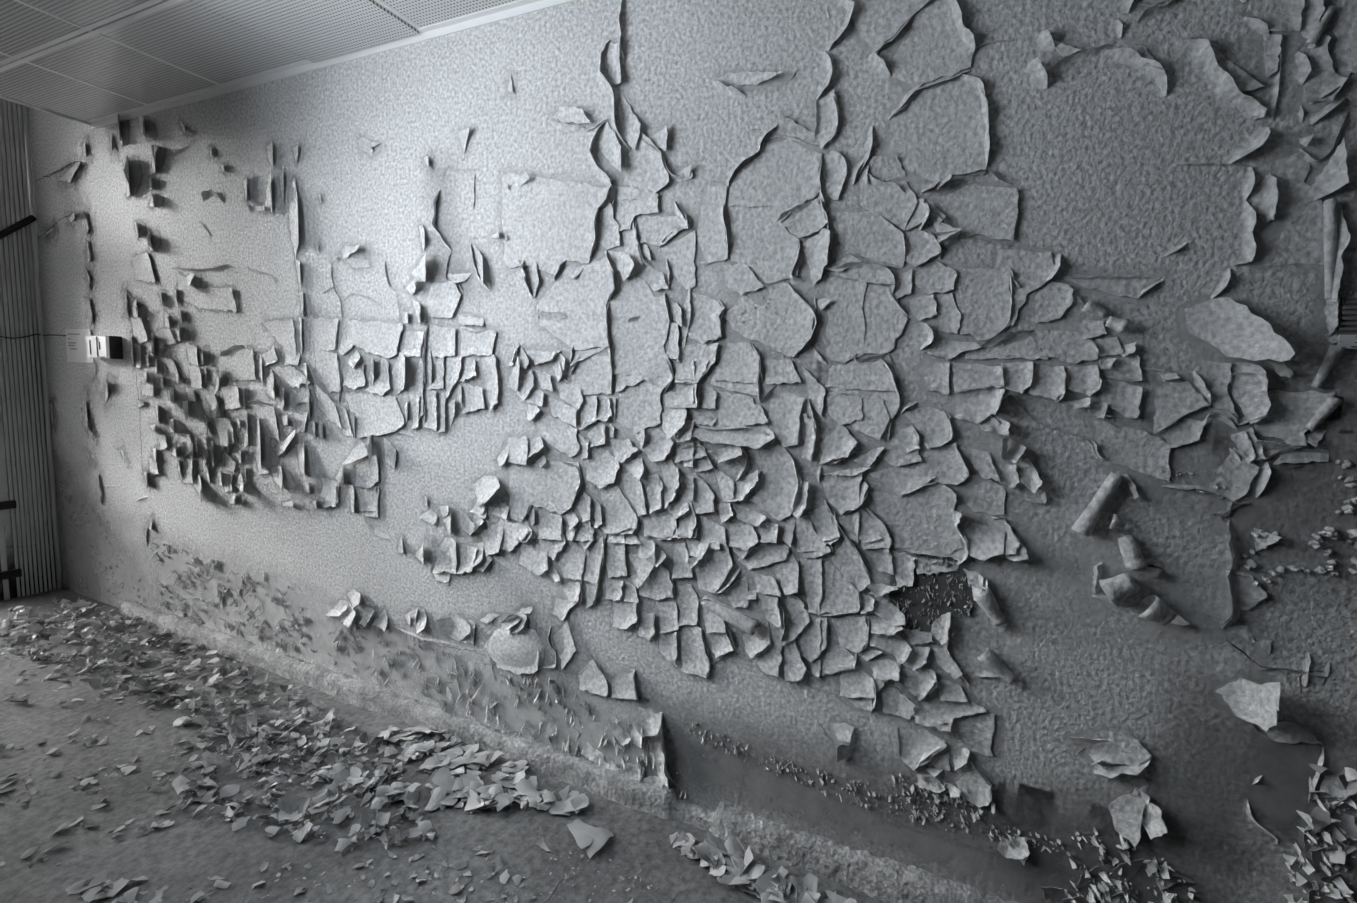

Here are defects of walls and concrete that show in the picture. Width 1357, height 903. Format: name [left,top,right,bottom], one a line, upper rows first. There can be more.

peeling [109,113,195,208]
peeling [121,141,504,539]
peeling [83,361,121,503]
peeling [407,0,1357,834]
peeling [60,479,316,663]
peeling [325,588,534,684]
peeling [225,800,246,818]
peeling [198,700,372,761]
peeling [401,782,421,795]
peeling [673,833,847,903]
peeling [980,727,1201,903]
spalling [1212,653,1357,903]